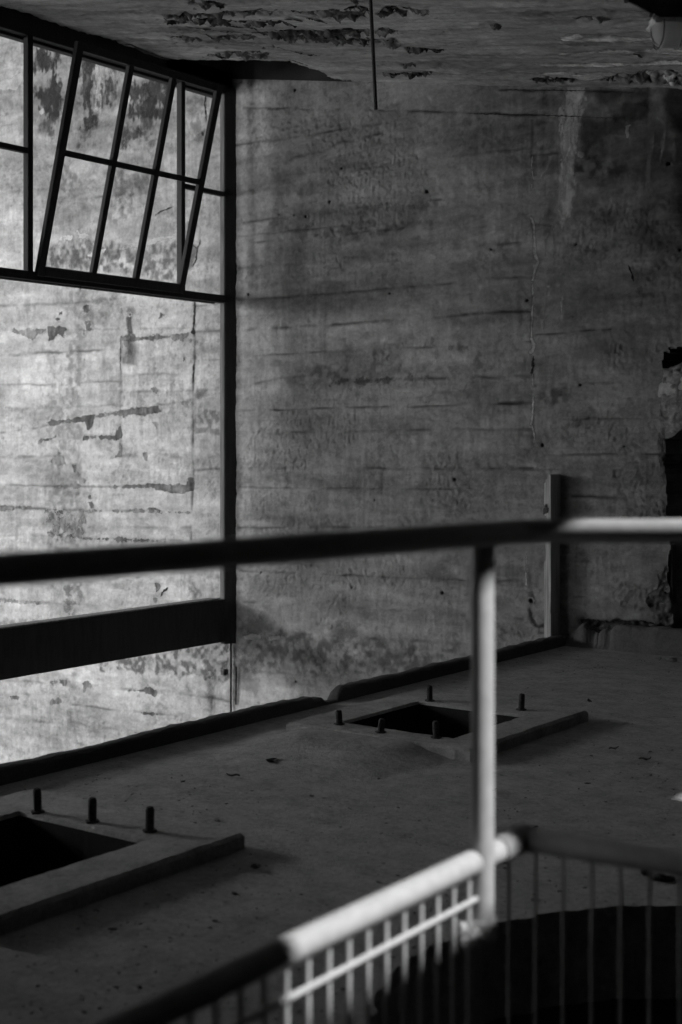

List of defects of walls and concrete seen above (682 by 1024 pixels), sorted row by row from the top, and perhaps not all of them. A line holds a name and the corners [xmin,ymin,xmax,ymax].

spalling [163,0,444,80]
spalling [532,76,575,85]
spalling [602,69,682,87]
water stain [558,87,624,217]
spalling [580,568,672,631]